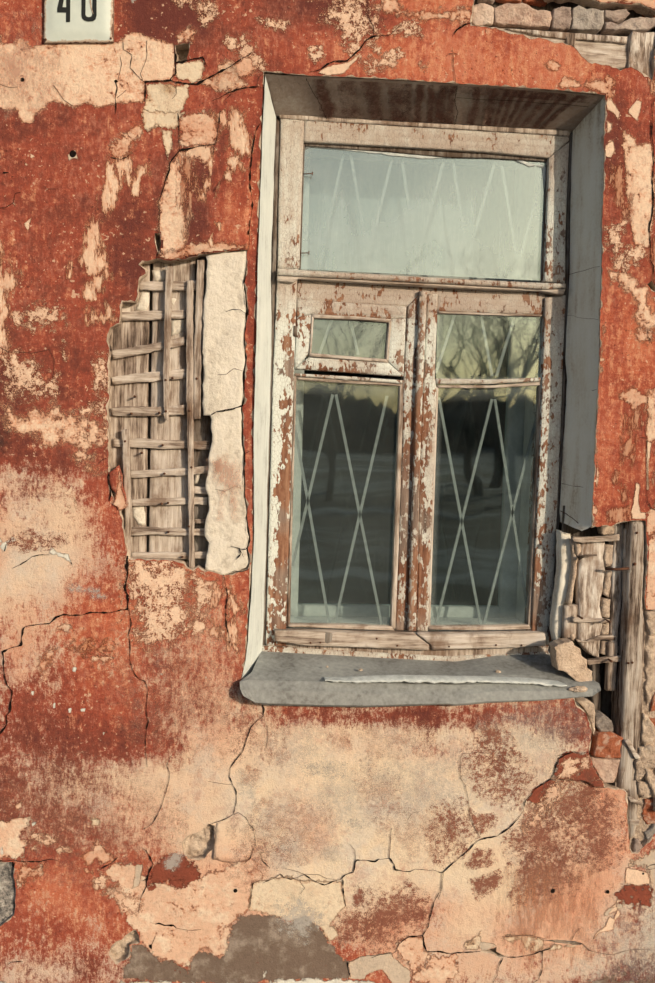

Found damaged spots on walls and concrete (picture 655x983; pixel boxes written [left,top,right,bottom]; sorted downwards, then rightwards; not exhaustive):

crack [647,98,655,285]
peeling [0,0,655,679]
crack [0,556,172,906]
peeling [0,698,655,983]
crack [208,705,639,982]